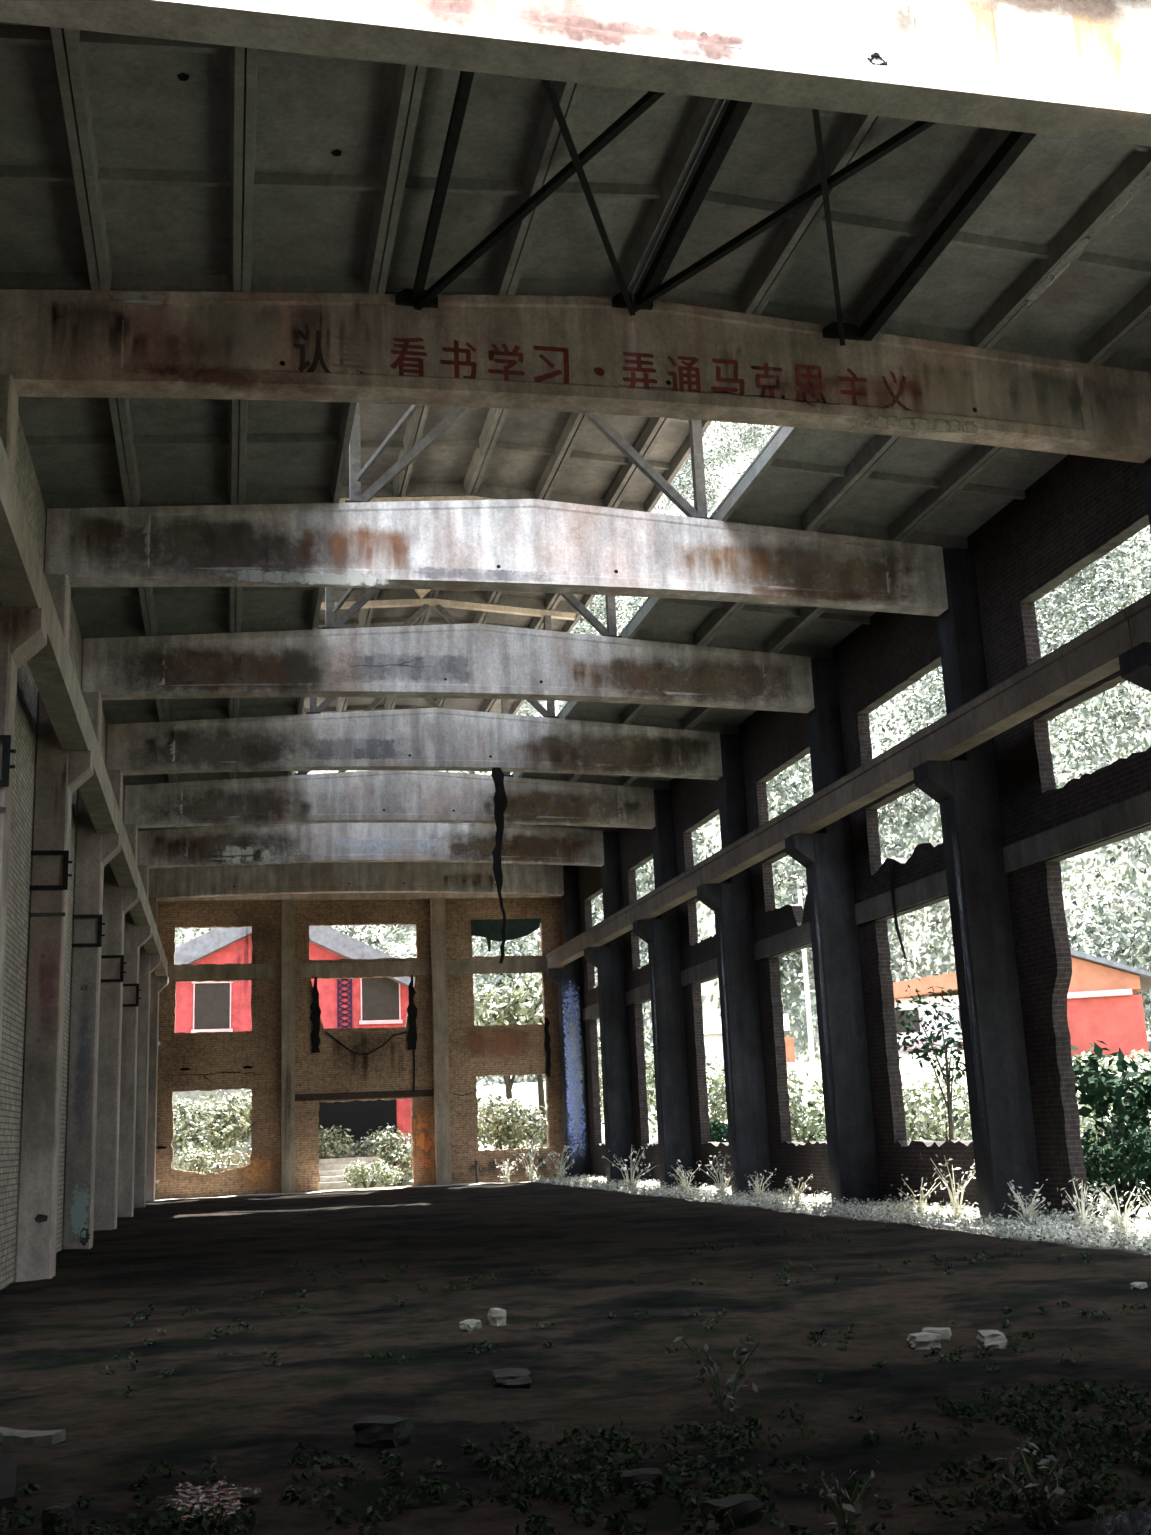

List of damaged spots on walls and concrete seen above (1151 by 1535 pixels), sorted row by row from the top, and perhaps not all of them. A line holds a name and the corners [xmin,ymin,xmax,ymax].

corrosion [1074,13,1130,65]
corrosion [330,531,407,558]